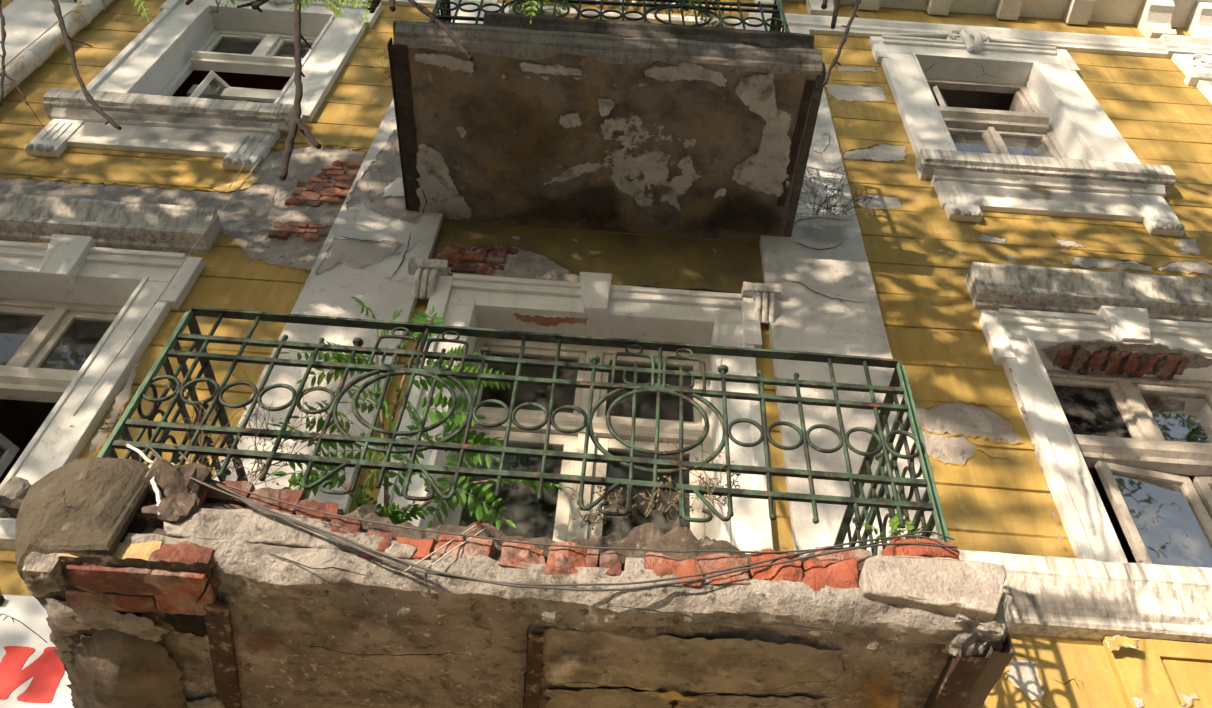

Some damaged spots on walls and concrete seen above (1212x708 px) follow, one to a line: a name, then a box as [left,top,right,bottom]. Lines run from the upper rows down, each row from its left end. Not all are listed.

peeling [824,66,887,103]
peeling [543,99,701,212]
peeling [639,62,792,199]
flaking render [0,126,472,275]
flaking render [434,236,580,282]
peeling [1051,232,1212,276]
spalling [123,444,212,537]
peeling [902,368,1064,540]
crack [522,625,834,708]
crack [608,606,853,652]
peeling [1003,659,1048,703]
crack [1043,673,1085,708]